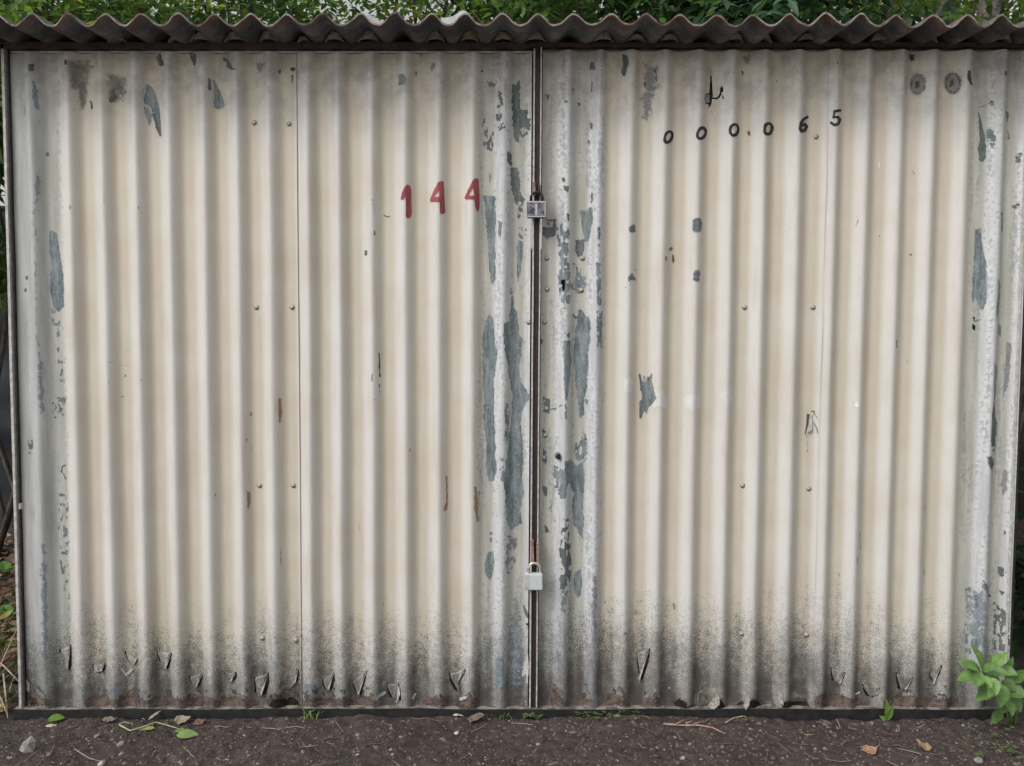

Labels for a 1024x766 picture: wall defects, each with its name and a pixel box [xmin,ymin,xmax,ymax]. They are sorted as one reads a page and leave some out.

peeling [142,84,161,136]
peeling [978,100,1010,162]
peeling [35,229,65,382]
peeling [36,335,66,419]
peeling [481,70,531,580]
peeling [639,373,656,419]
peeling [972,227,1012,495]
peeling [543,433,597,642]
peeling [962,567,1011,654]